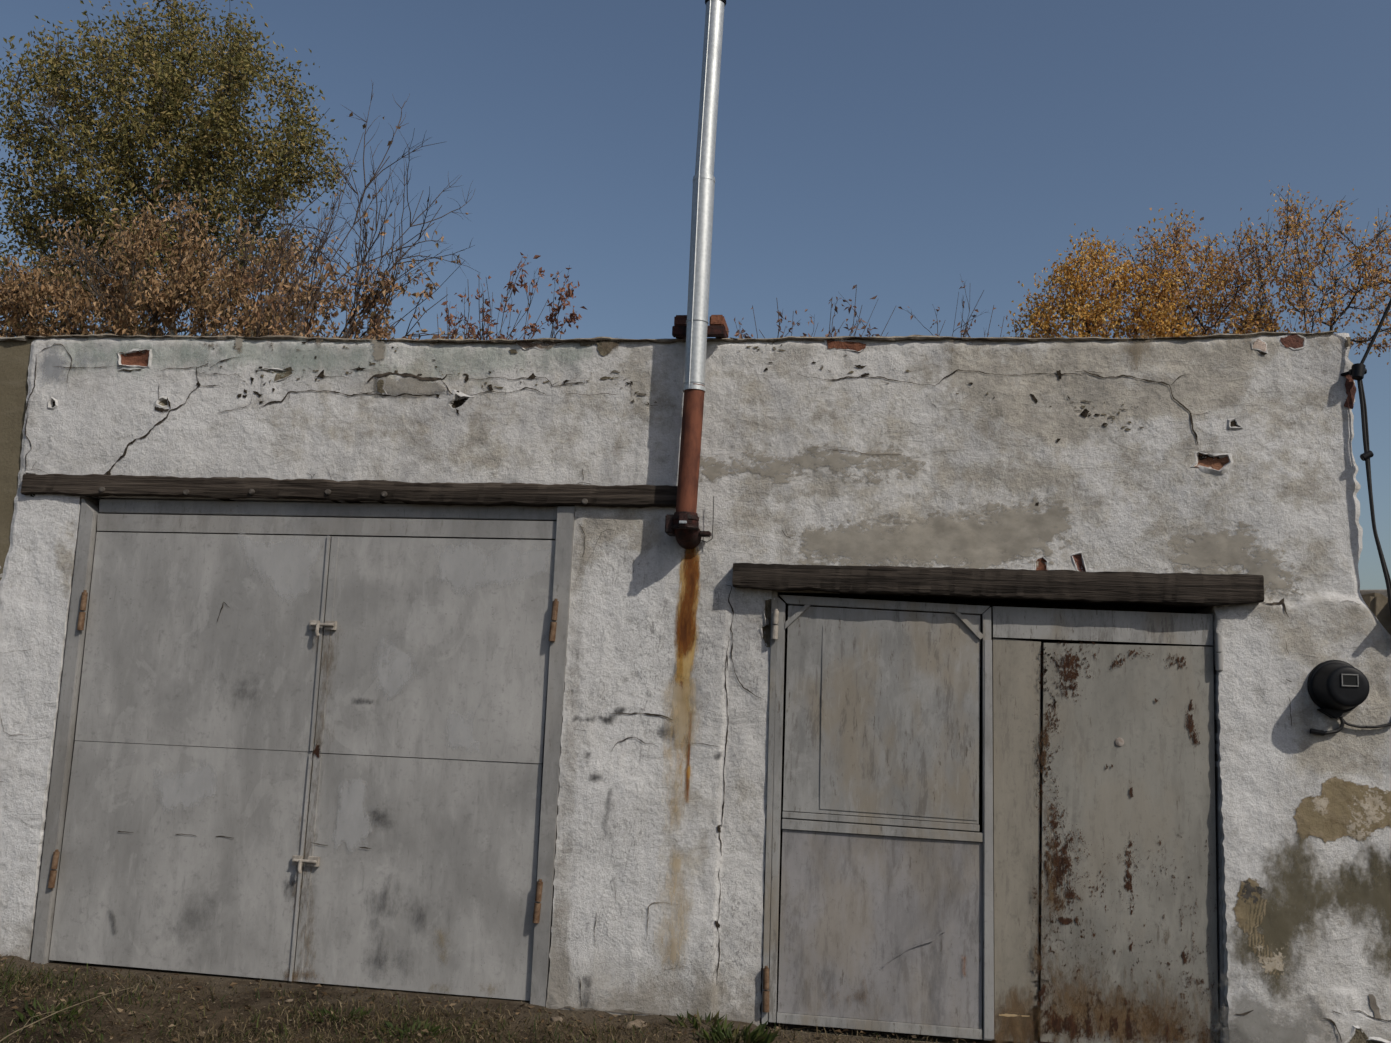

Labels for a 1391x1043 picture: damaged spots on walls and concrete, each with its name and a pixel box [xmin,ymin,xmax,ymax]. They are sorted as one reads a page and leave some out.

crack [25,343,111,474]
flaking render [116,348,153,372]
crack [104,357,658,475]
crack [799,365,1210,445]
flaking render [1191,451,1233,476]
corrosion [672,547,699,810]
crack [576,585,764,976]
corrosion [994,638,1220,1043]
peeling [1293,776,1391,843]
peeling [1233,878,1287,979]
flaking render [1344,1025,1391,1043]
flaking render [1368,994,1381,1019]